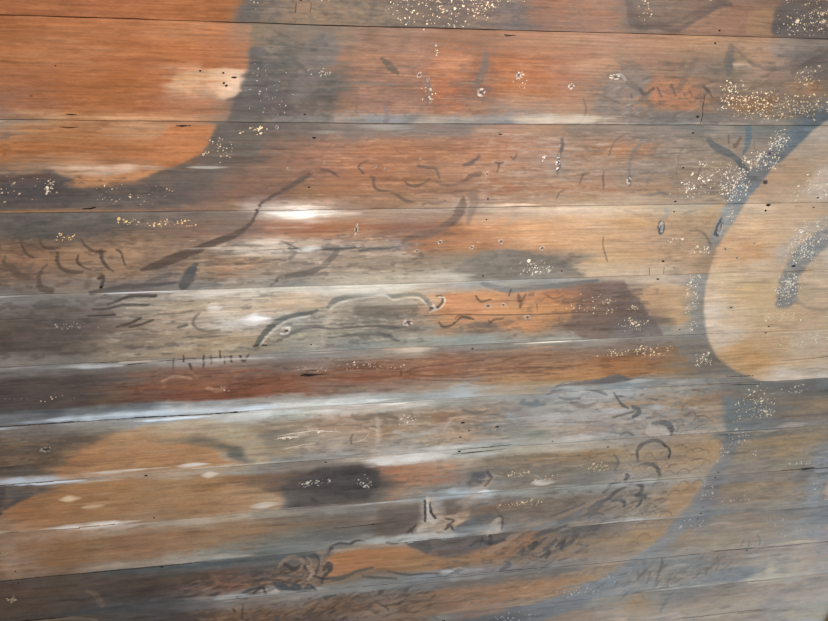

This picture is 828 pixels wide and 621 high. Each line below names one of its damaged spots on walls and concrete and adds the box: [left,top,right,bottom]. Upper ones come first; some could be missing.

leakage [0,403,673,510]
leakage [31,473,708,531]